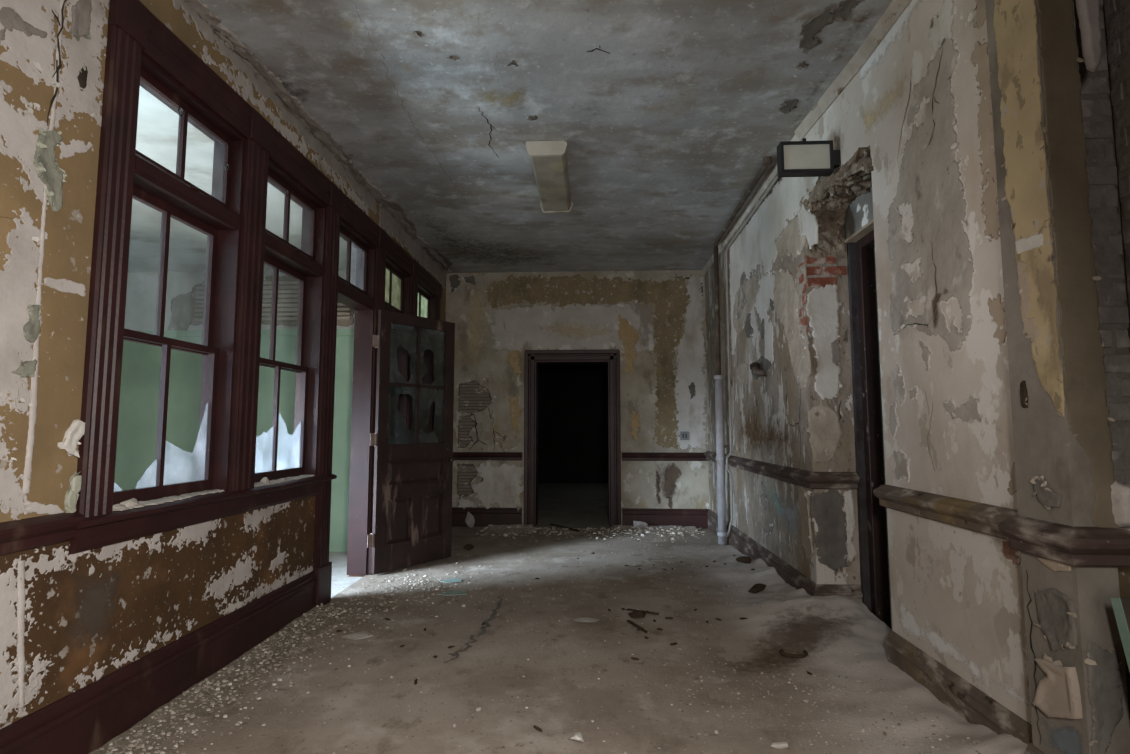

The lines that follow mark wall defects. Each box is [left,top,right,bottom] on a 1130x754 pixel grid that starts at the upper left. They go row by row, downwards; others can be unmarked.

spalling [795,0,865,70]
peeling [0,0,110,520]
peeling [172,0,708,452]
peeling [729,147,874,463]
peeling [886,0,1130,528]
peeling [0,518,222,724]
peeling [205,501,313,615]
crack [444,595,503,663]
spalling [807,489,857,571]
spalling [1032,588,1124,754]